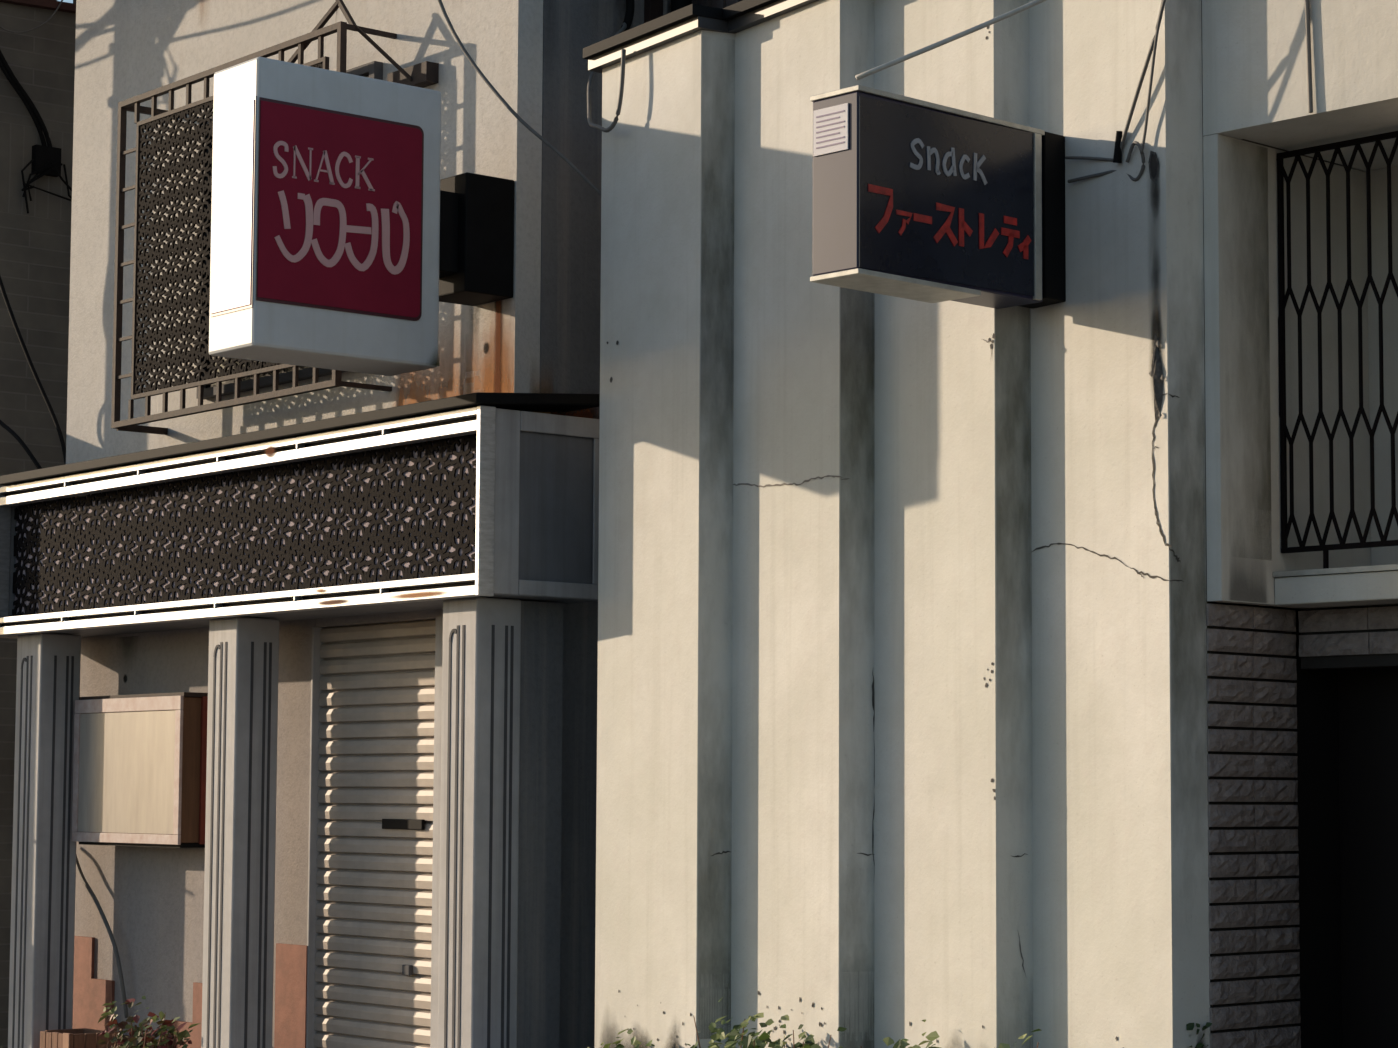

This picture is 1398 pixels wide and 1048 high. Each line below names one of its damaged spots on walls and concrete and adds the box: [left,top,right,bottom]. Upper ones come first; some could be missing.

rust [398,300,514,406]
rust [537,408,599,419]
crack [733,475,850,487]
crack [1032,393,1184,582]